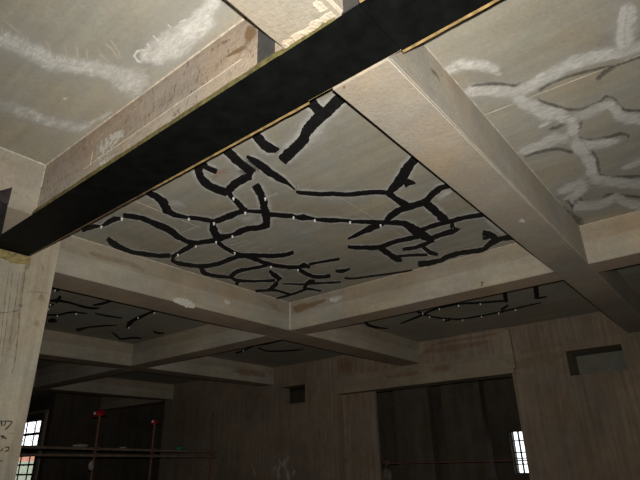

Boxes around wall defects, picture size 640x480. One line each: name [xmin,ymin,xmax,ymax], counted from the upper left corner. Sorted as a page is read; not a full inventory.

water stain [0,0,221,95]
spalling [281,0,337,49]
water stain [1,102,110,132]
water stain [445,3,640,224]
crack [81,92,515,299]
crack [47,287,164,340]
peeling [173,298,195,308]
crack [364,285,547,329]